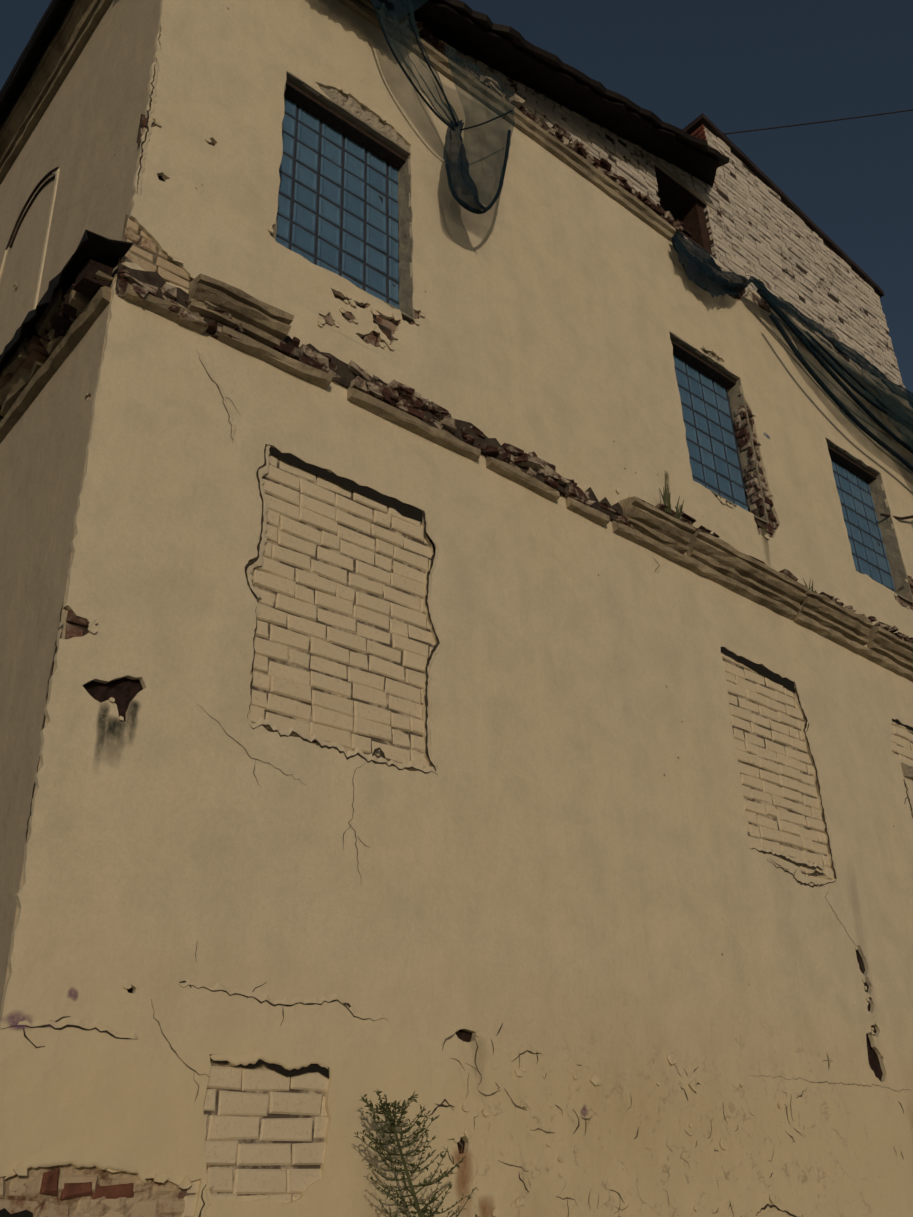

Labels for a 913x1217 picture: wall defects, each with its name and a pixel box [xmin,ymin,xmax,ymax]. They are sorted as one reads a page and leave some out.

crack [137,27,161,196]
flaking render [317,290,425,351]
flaking render [273,337,634,529]
flaking render [628,494,719,538]
crack [198,351,443,885]
hole [83,677,143,722]
crack [179,946,389,1026]
crack [0,999,209,1102]
crack [429,1023,601,1173]
crack [627,1052,911,1217]
flaking render [0,1162,217,1217]
crack [492,1160,629,1217]